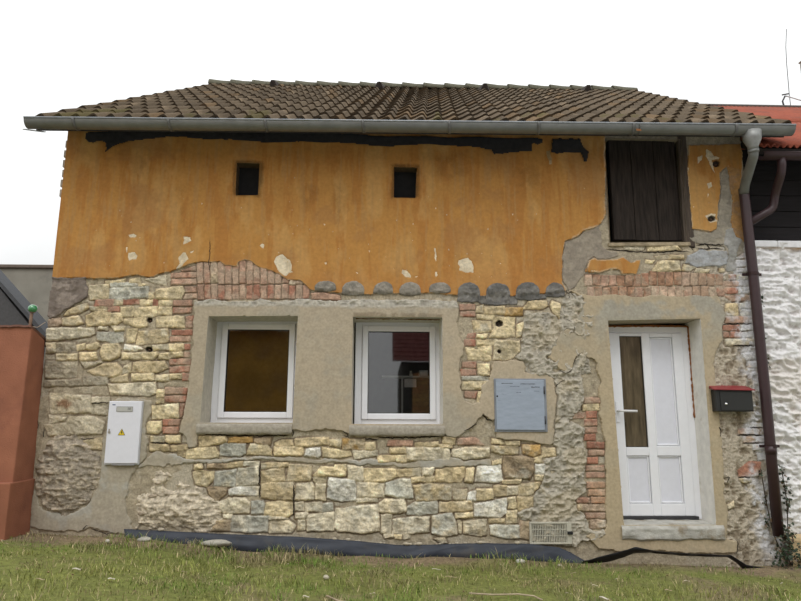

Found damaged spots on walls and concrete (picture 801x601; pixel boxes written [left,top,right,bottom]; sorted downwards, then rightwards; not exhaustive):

peeling [698,149,719,171]
peeling [458,258,474,278]